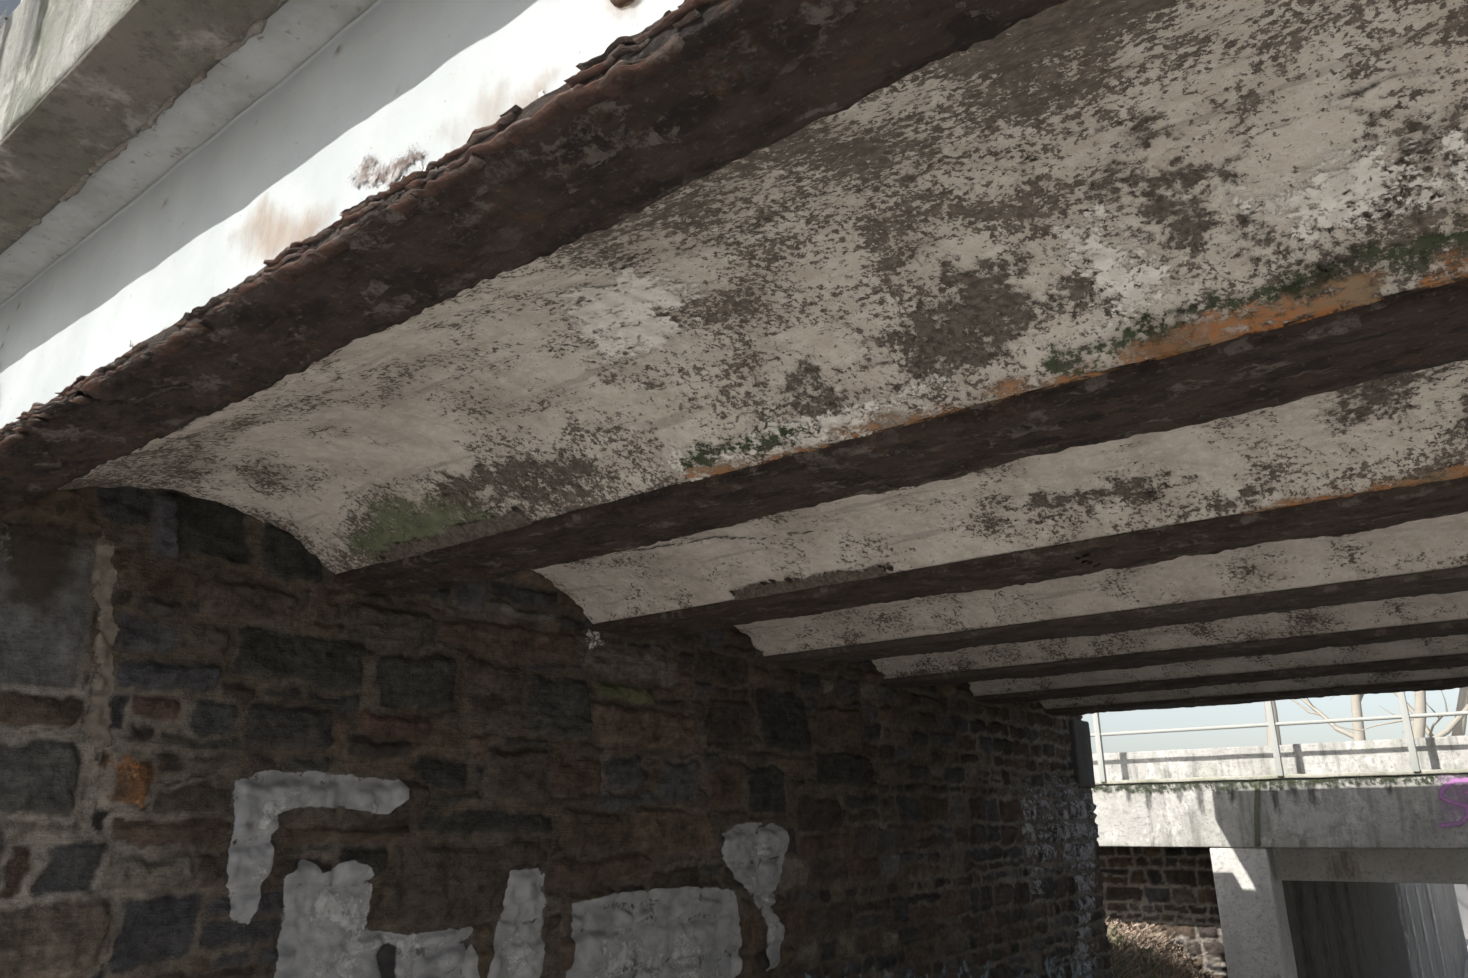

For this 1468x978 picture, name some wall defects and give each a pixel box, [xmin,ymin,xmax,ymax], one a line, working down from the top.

leakage [20,0,39,60]
leakage [190,0,285,86]
leakage [14,96,176,240]
corrosion [1418,251,1468,289]
corrosion [985,271,1384,404]
corrosion [684,405,966,478]
peeling [377,432,616,563]